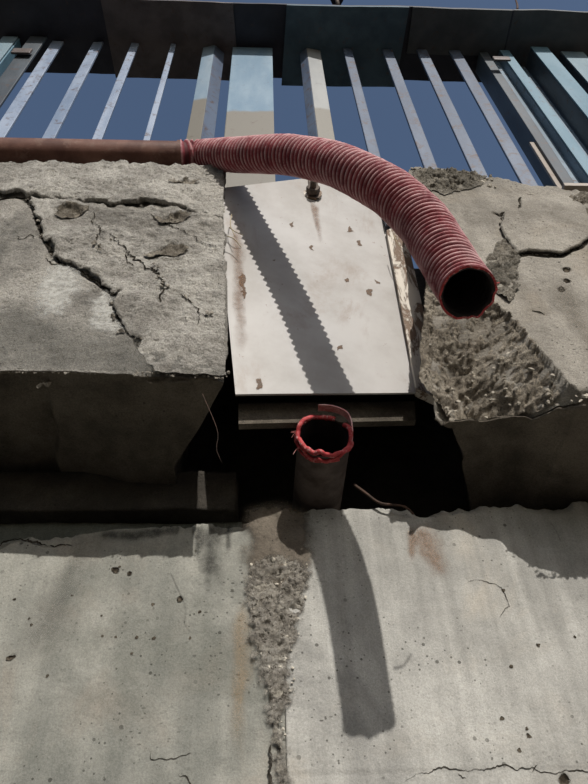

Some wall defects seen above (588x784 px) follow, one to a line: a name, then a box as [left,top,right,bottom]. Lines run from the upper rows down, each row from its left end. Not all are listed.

spalling [412,166,486,195]
crack [0,192,142,347]
crack [91,204,217,325]
spalling [419,190,588,421]
crack [0,538,69,547]
spalling [243,555,312,784]
crack [267,722,285,784]
crack [409,764,588,779]